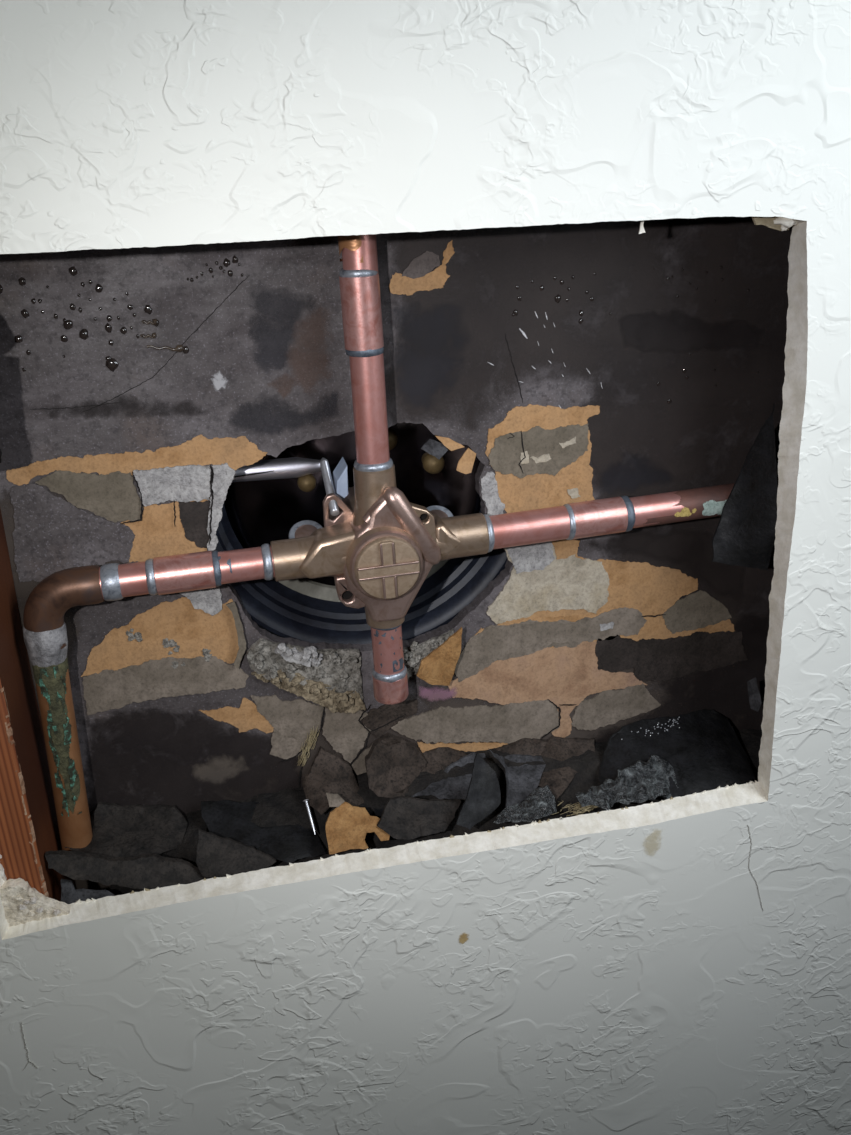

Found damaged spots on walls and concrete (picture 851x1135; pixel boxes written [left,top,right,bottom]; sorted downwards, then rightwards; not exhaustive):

water stain [385,216,792,499]
spalling [246,638,366,714]
spalling [403,628,454,679]
peeling [325,792,390,854]
crack [748,826,763,909]